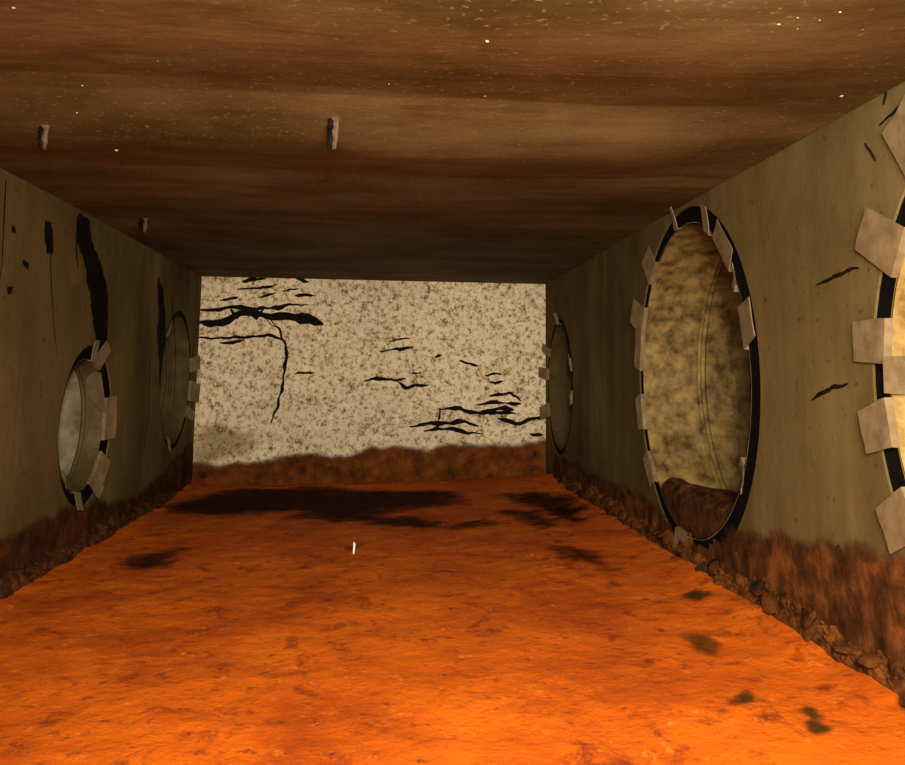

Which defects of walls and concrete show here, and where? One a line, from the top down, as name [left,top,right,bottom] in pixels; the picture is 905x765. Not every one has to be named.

damp [0,181,16,277]
damp [45,221,57,350]
damp [76,213,108,351]
crack [199,277,323,424]
crack [380,337,414,352]
crack [364,354,545,437]